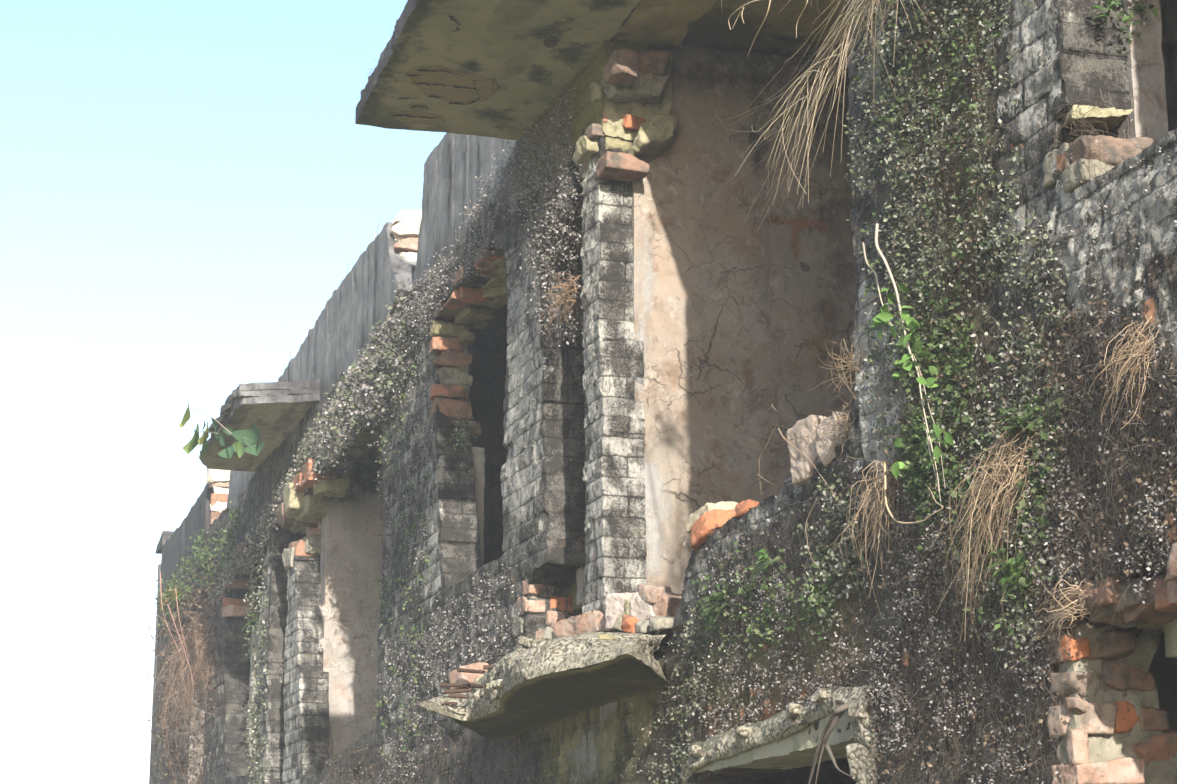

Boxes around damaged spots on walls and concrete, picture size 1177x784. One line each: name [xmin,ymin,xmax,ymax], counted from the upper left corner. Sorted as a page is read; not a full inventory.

crack [644,305,745,415]
crack [774,318,854,430]
crack [662,478,701,508]
spalling [419,571,682,721]
spalling [680,671,880,784]